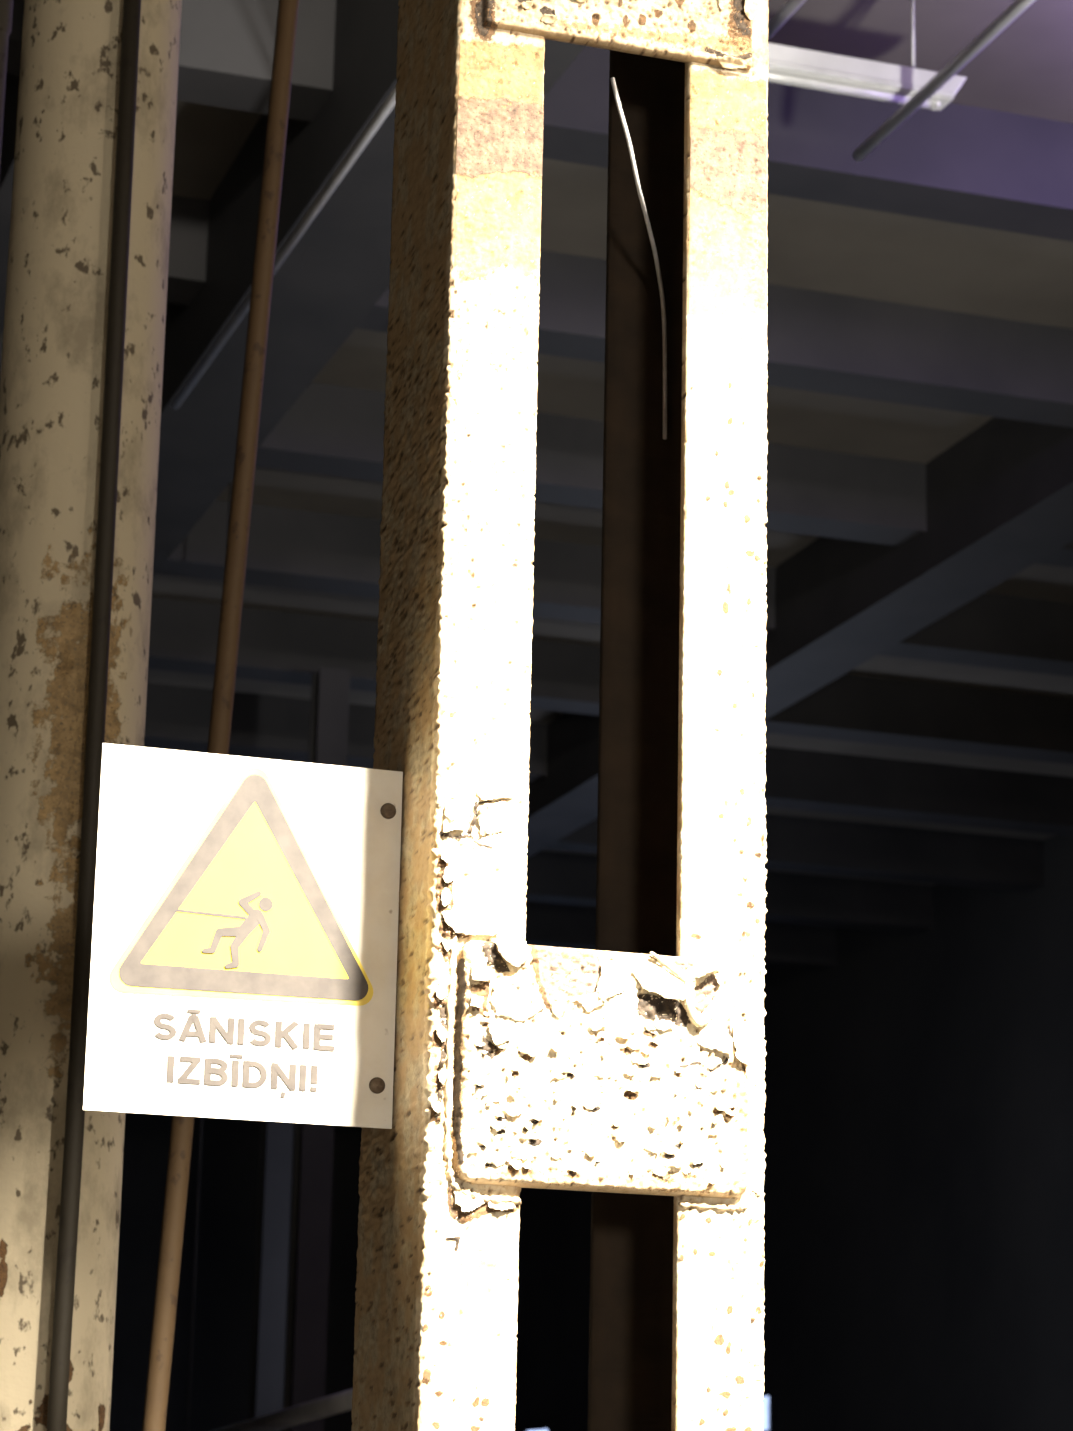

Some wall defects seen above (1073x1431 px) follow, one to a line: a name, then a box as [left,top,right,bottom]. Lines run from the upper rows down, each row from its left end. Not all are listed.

crack [439,788,514,849]
peeling [436,852,462,962]
peeling [432,984,448,1050]
peeling [469,930,754,1185]
peeling [430,1069,447,1123]